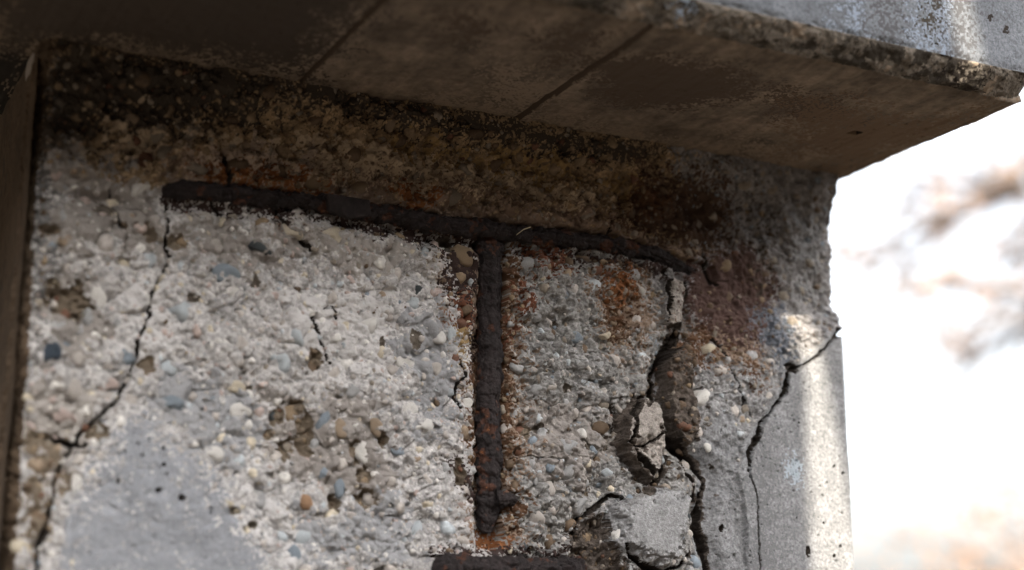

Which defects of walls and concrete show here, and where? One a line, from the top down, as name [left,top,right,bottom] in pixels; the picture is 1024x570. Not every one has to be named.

crack [34,205,173,570]
crack [108,189,122,228]
spalling [14,145,843,570]
leakage [0,0,866,387]
rust [156,82,1019,558]
crack [569,493,625,535]
crack [625,254,719,570]
leakage [697,391,816,570]
crack [709,328,839,570]